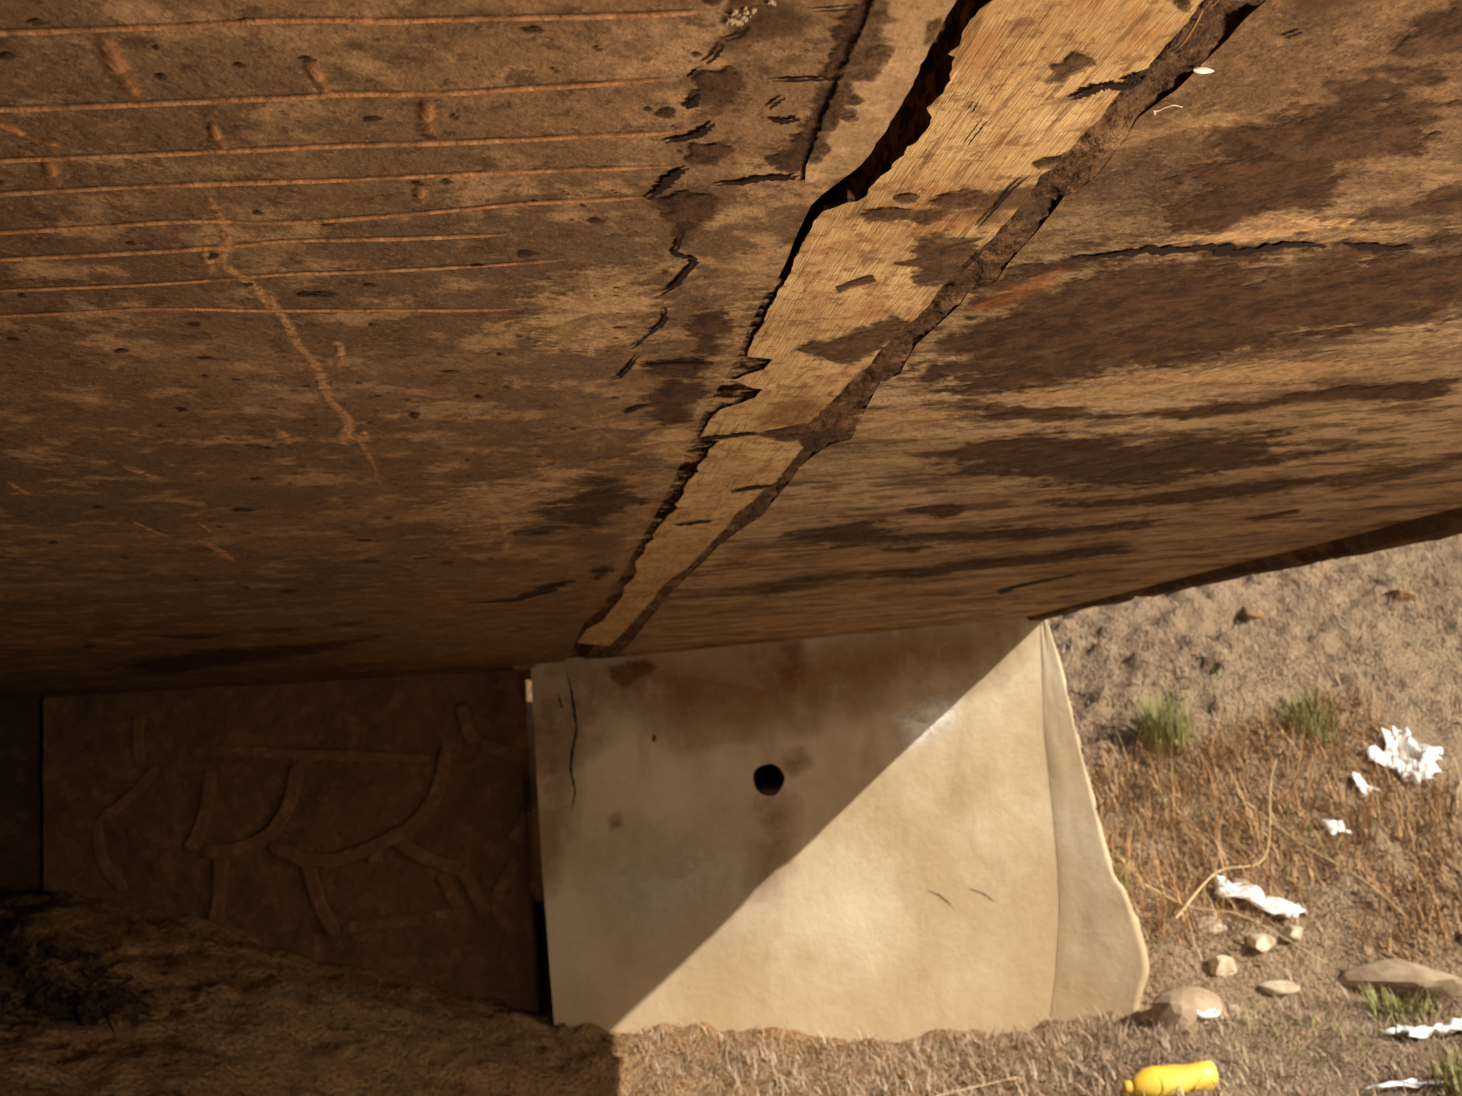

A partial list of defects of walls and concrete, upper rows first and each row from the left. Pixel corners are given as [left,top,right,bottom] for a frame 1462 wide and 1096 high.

leakage [690,5,812,110]
crack [1070,74,1147,100]
crack [967,102,987,147]
leakage [685,144,736,166]
leakage [652,189,727,247]
crack [1073,242,1416,260]
leakage [713,0,1462,596]
leakage [641,310,736,427]
crack [700,433,761,442]
leakage [506,473,653,536]
crack [675,485,775,526]
crack [558,670,578,811]